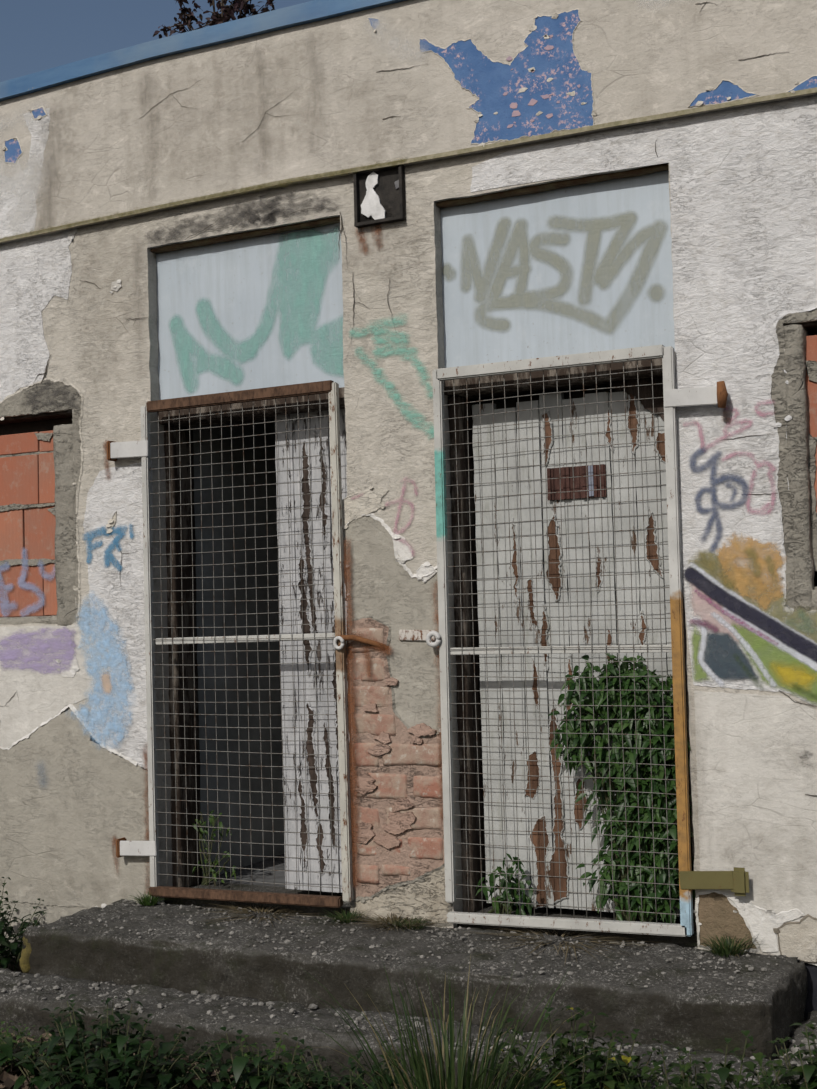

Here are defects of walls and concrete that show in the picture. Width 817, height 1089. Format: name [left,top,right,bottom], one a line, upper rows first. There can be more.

spalling [28,106,48,120]
peeling [418,9,597,147]
peeling [688,79,760,108]
peeling [786,75,817,93]
peeling [2,137,23,164]
spalling [768,307,817,609]
spalling [0,378,83,624]
peeling [104,511,117,533]
peeling [298,436,328,672]
spalling [298,486,453,927]
spalling [693,890,805,953]